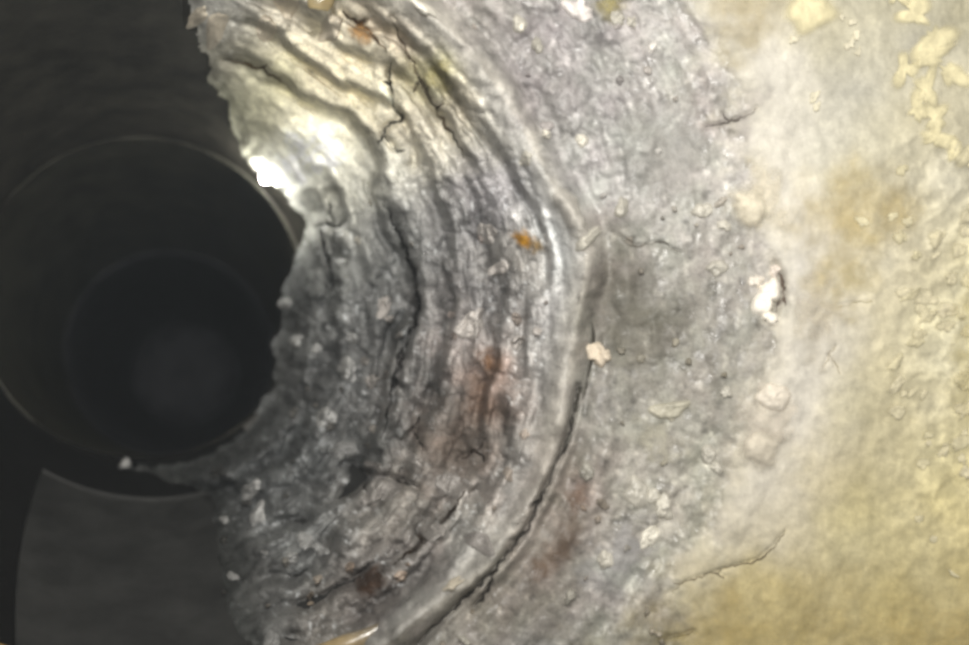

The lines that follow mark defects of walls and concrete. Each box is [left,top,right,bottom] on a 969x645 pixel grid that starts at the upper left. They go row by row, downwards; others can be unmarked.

crack [342,11,464,159]
corrosion [514,233,541,249]
spalling [388,0,791,645]
crack [394,490,466,565]
crack [416,387,578,645]
crack [672,530,785,592]